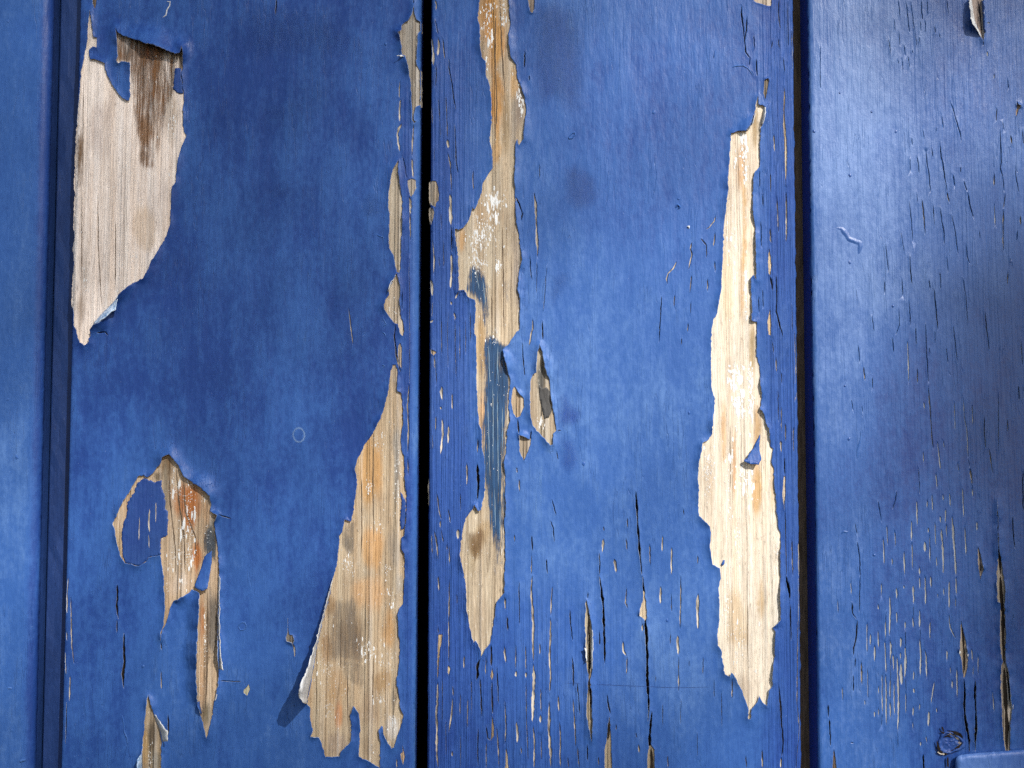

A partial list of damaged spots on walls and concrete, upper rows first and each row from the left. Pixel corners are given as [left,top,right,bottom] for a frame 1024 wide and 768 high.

peeling [71,0,186,345]
water stain [117,33,183,166]
peeling [113,454,224,738]
peeling [298,161,416,768]
peeling [397,8,423,123]
crack [394,0,474,464]
peeling [455,0,558,656]
crack [516,166,547,375]
crack [428,441,703,767]
peeling [698,78,786,719]
crack [888,2,948,68]
crack [827,86,1024,768]